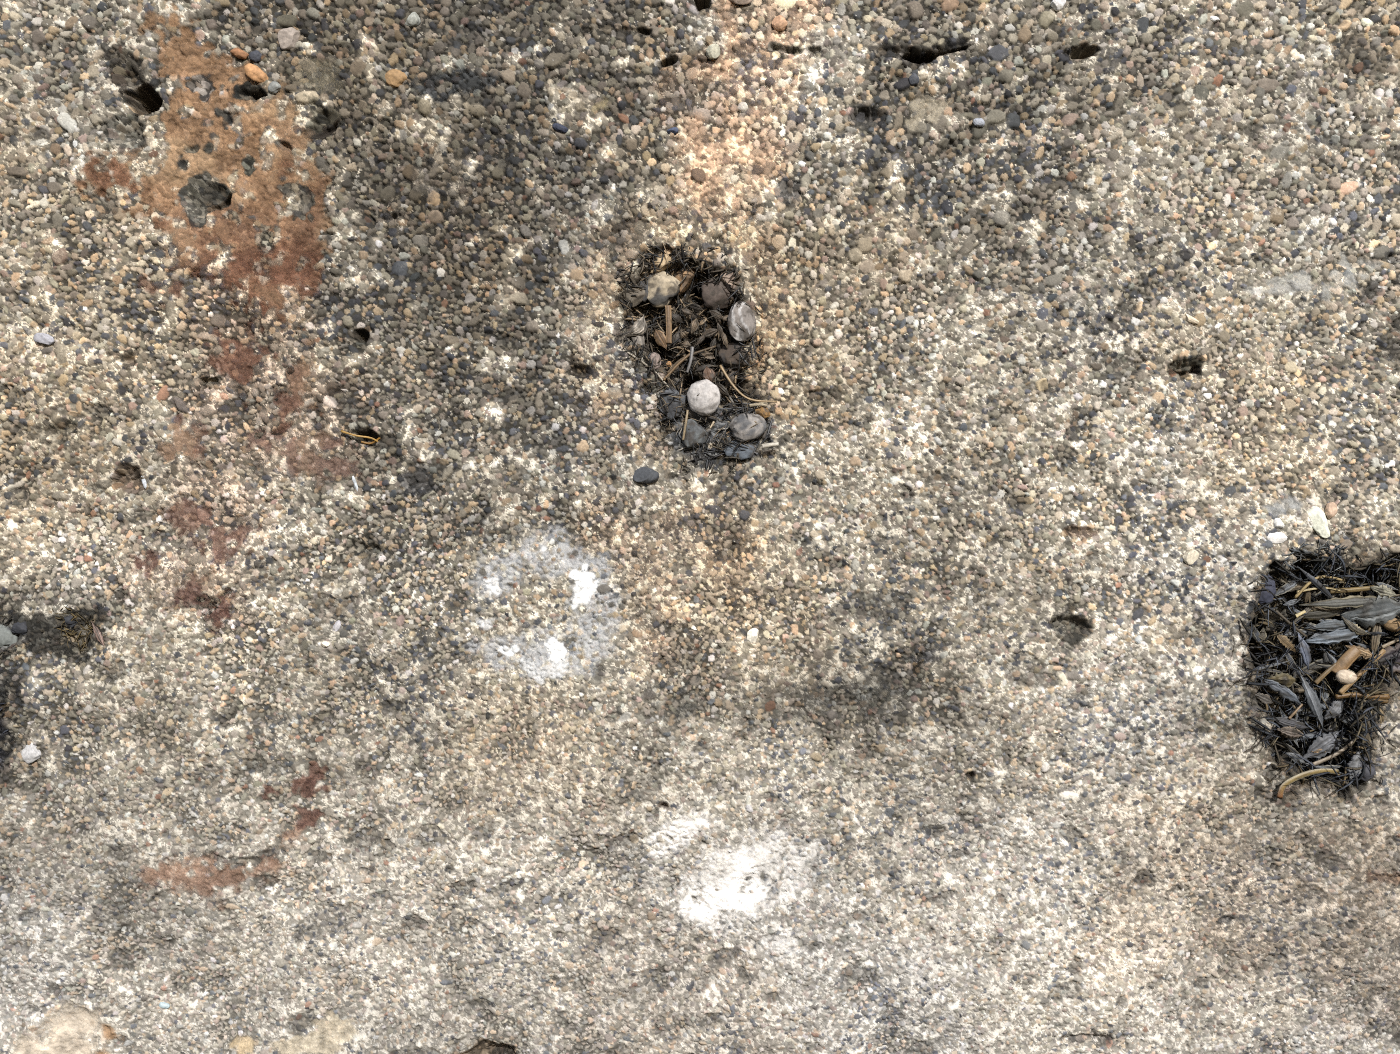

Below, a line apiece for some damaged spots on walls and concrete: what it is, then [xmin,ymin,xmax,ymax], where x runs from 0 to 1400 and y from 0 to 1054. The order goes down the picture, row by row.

rust [75,6,333,321]
spalling [616,245,762,408]
rust [206,327,276,384]
rust [158,414,207,460]
rust [248,364,358,479]
peeling [1308,506,1330,538]
damp [482,577,500,596]
damp [569,563,599,609]
spalling [55,607,100,657]
damp [498,637,567,684]
spalling [1245,518,1400,800]